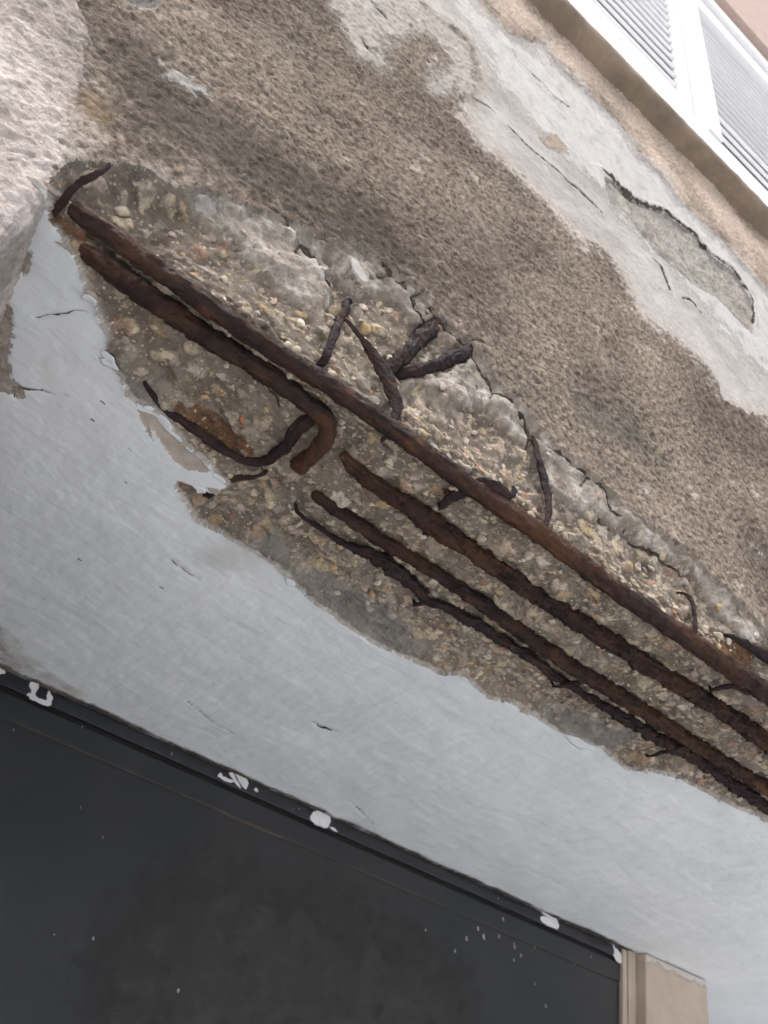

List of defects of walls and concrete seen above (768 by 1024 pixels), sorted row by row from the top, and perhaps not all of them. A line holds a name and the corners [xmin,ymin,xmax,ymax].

peeling [328,0,768,415]
crack [510,128,602,213]
spalling [45,158,768,823]
rust [50,162,768,755]
rust [294,490,768,815]